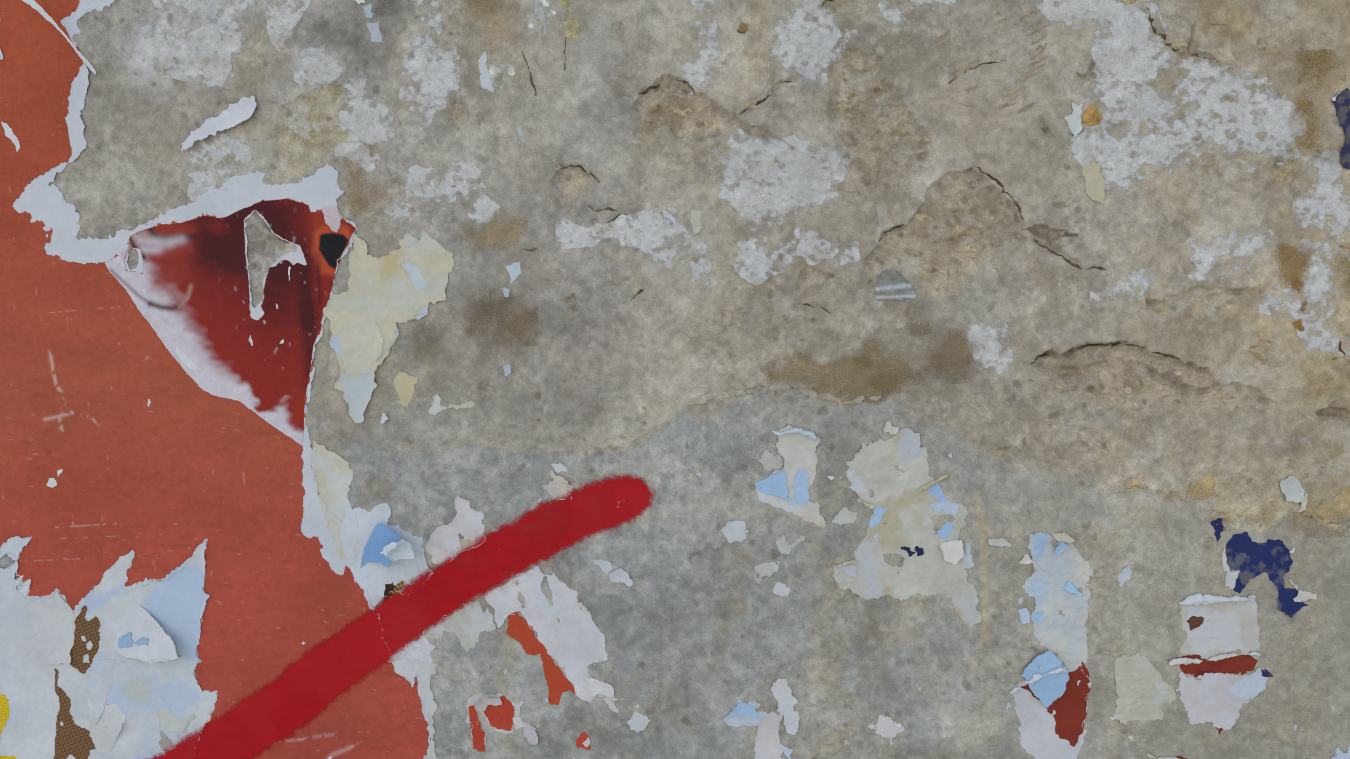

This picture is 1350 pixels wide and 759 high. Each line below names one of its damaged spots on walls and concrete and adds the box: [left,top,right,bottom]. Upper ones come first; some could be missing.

flaking render [630,0,1088,304]
peeling [1035,0,1350,358]
peeling [967,316,1013,375]
flaking render [1031,340,1277,422]